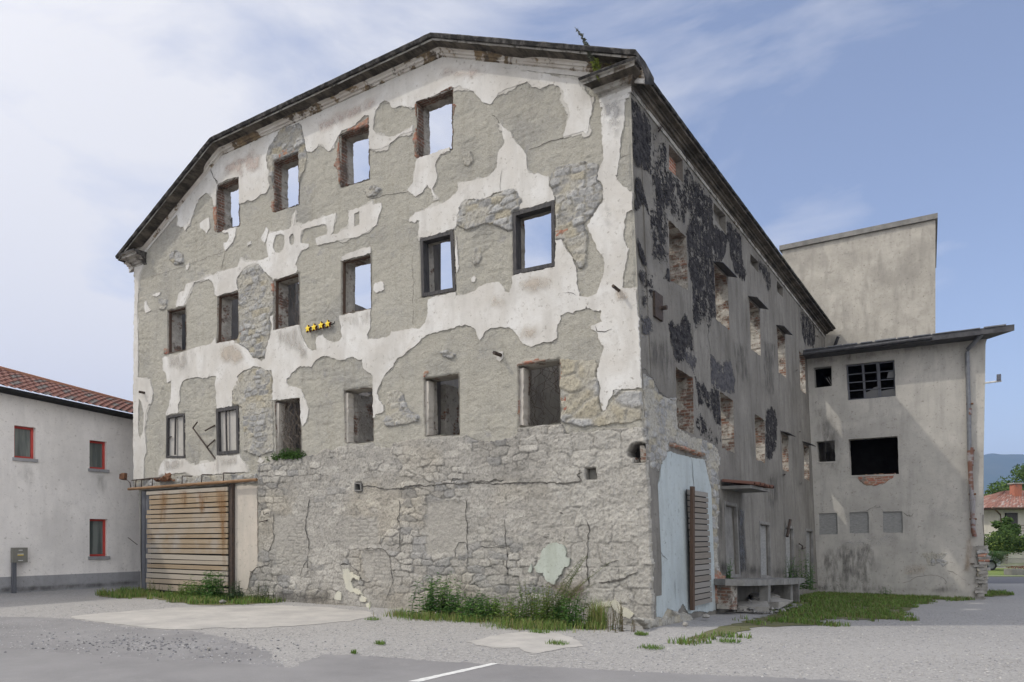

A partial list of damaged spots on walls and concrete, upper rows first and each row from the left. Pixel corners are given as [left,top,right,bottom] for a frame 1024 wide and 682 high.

spalling [133,58,746,629]
crack [300,498,310,575]
crack [341,472,582,596]
flaking render [858,473,896,486]